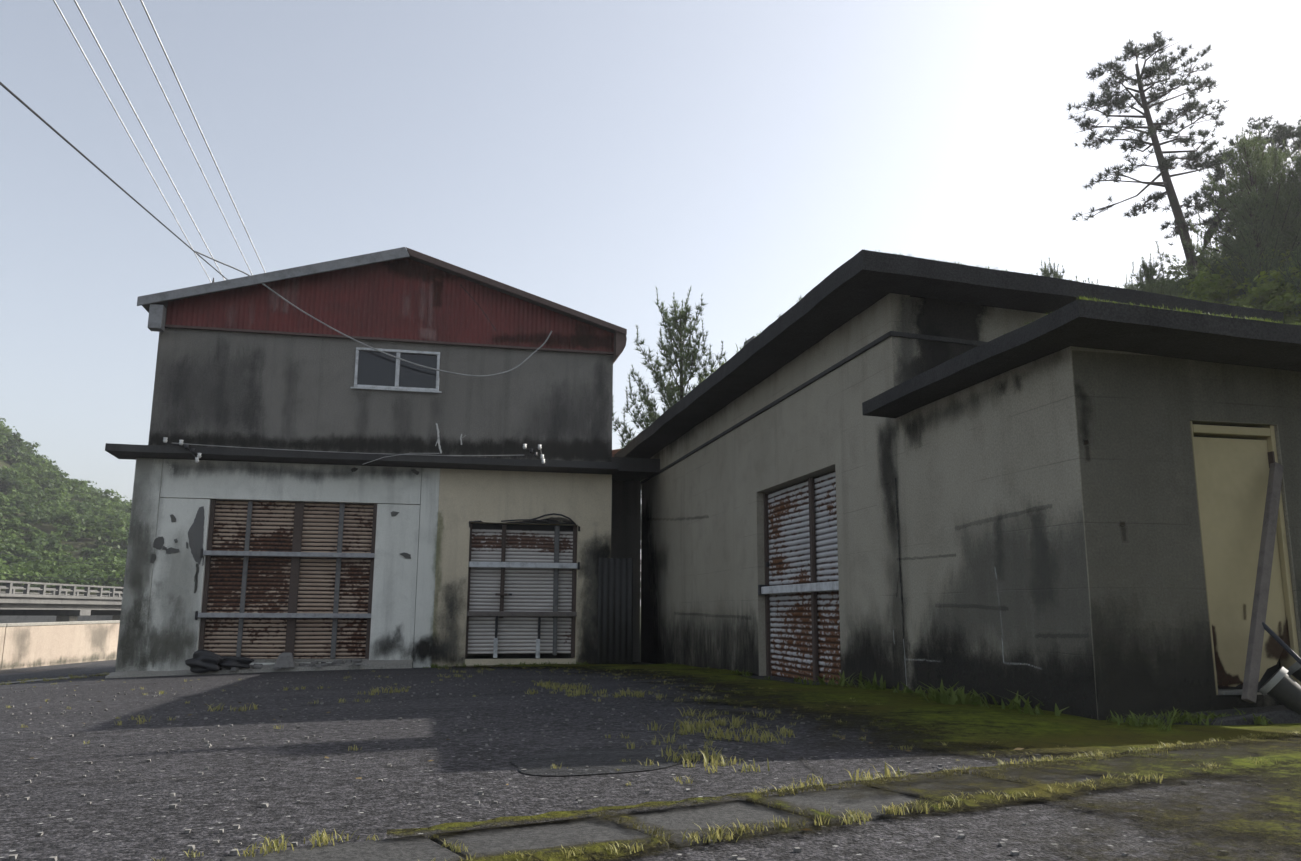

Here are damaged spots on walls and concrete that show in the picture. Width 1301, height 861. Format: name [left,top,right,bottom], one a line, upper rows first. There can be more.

water stain [899,297,989,382]
water stain [879,418,931,520]
peeling [150,506,205,566]
water stain [33,602,192,667]
water stain [840,628,1282,720]